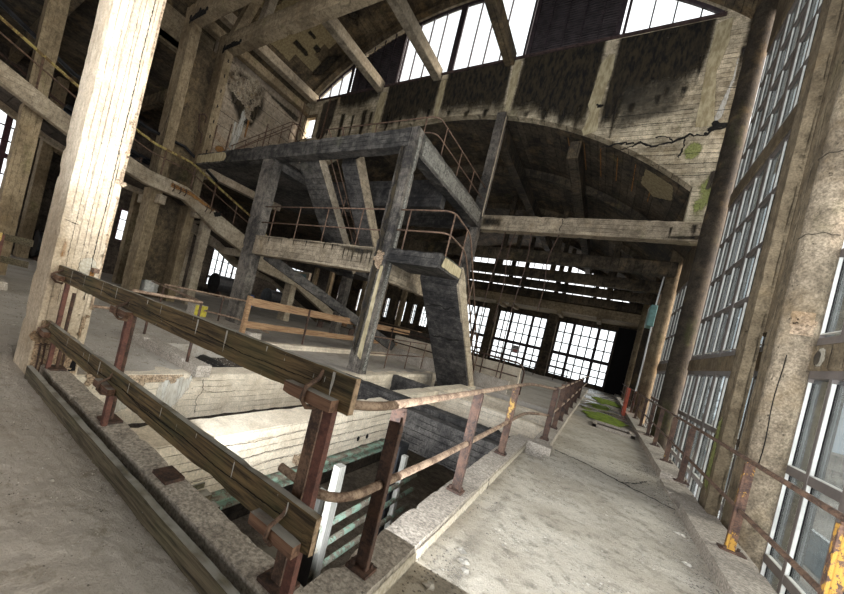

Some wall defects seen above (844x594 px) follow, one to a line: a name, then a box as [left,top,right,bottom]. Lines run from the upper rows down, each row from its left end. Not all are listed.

spalling [220,39,263,123]
leakage [316,92,401,139]
leakage [558,54,616,135]
crack [602,109,730,176]
crack [758,355,787,463]